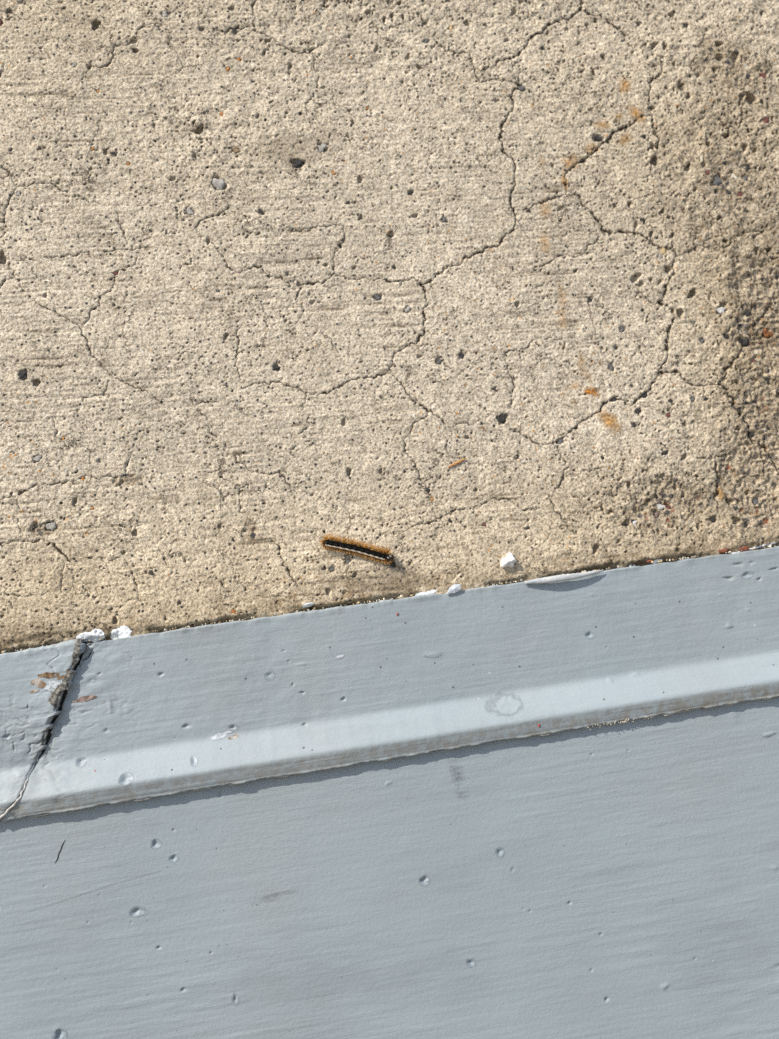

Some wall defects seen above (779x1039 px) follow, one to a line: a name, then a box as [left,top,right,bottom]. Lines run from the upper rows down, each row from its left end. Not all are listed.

crack [65,23,158,92]
crack [0,166,164,445]
crack [197,0,779,536]
crack [0,453,140,613]
peeling [30,638,97,709]
crack [36,641,91,764]